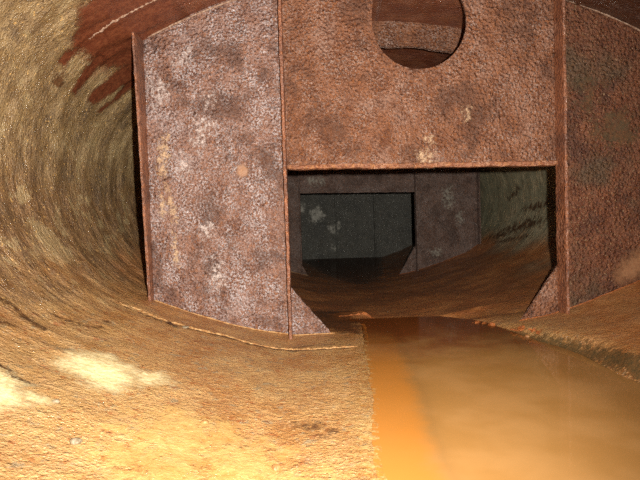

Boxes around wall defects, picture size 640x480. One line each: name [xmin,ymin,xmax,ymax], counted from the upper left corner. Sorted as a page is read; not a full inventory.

rust [52,0,187,113]
rust [615,250,640,282]